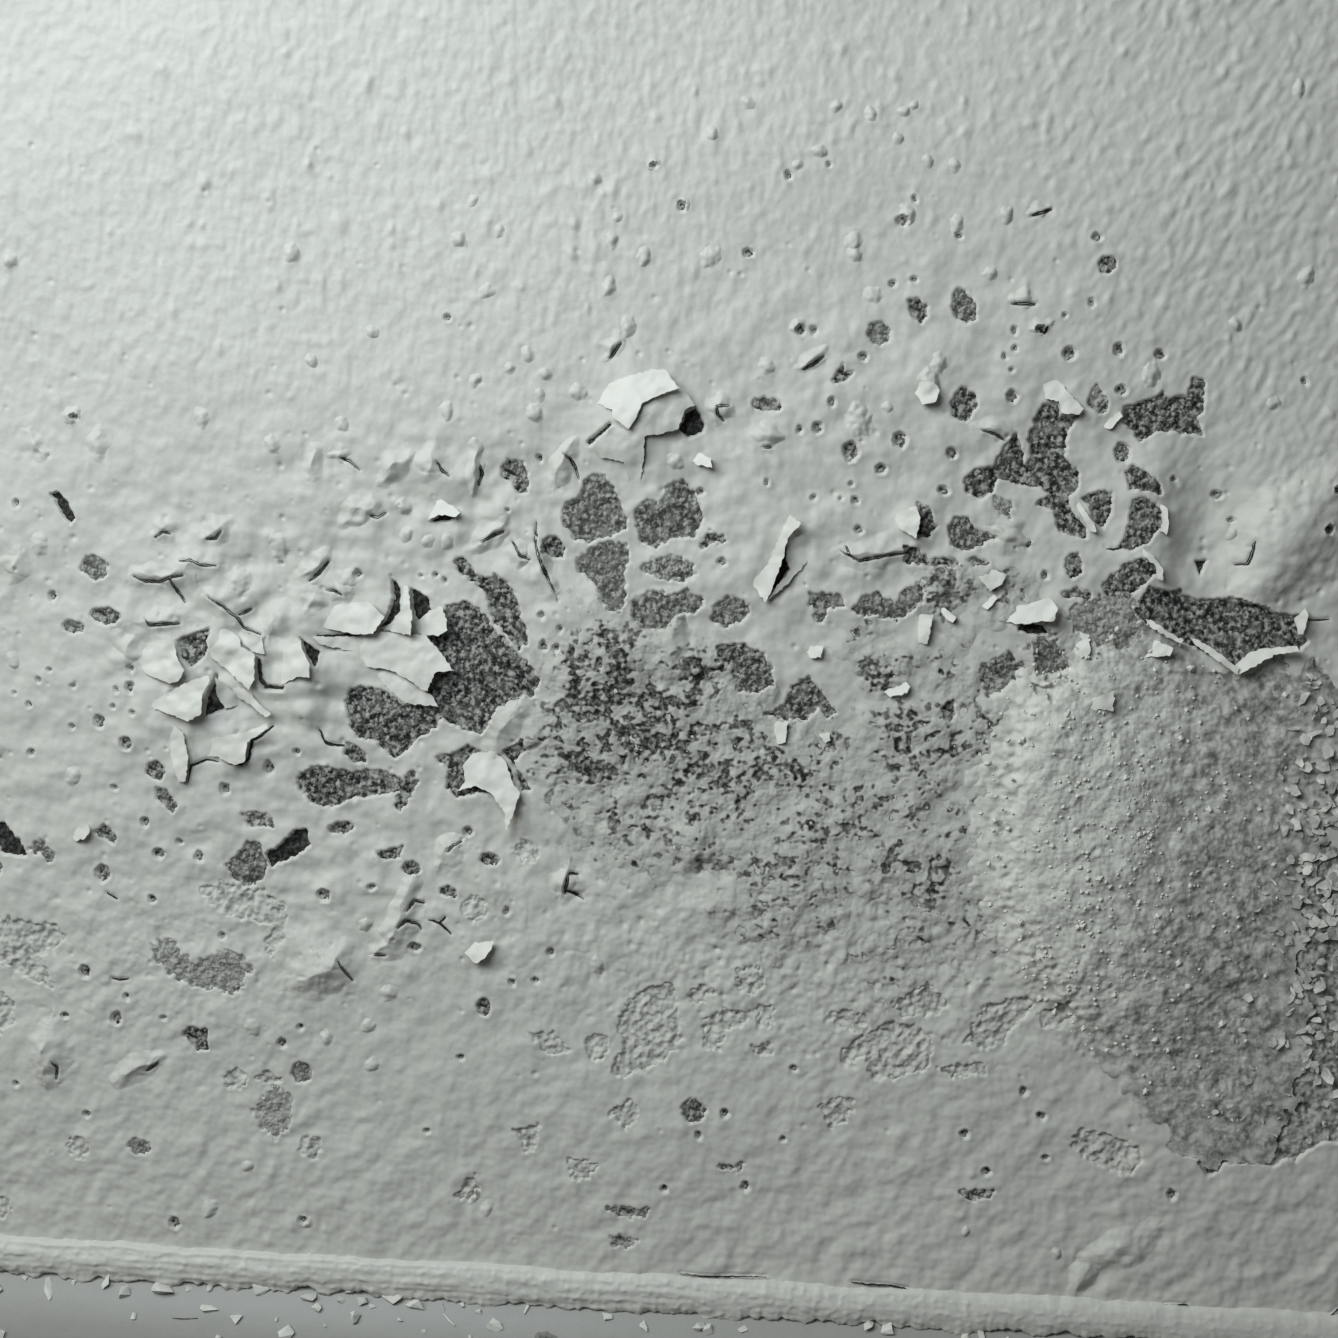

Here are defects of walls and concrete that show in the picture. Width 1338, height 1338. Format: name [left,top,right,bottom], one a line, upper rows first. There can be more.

peeling [829,322,891,406]
peeling [53,492,75,523]
peeling [80,555,109,581]
peeling [64,607,121,634]
peeling [96,369,1309,1081]
peeling [0,822,56,872]
peeling [73,824,117,844]
peeling [1211,660,1338,1166]
peeling [609,1099,638,1128]
peeling [681,1098,707,1138]
peeling [818,1097,855,1128]
peeling [1071,1128,1142,1175]